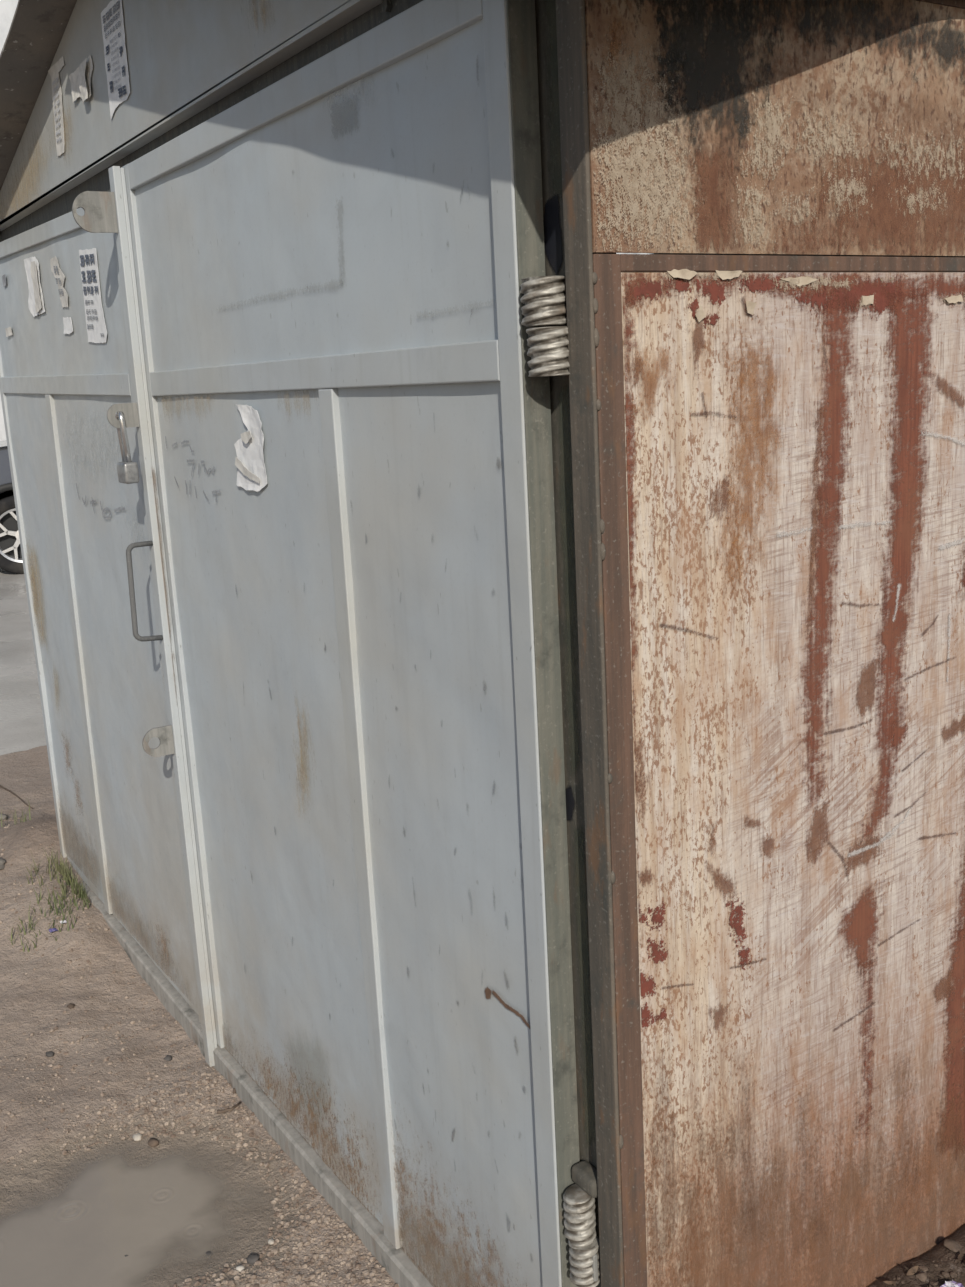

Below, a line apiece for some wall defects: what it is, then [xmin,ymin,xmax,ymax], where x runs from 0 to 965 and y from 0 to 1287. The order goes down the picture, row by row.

leakage [637,0,965,153]
rust [690,148,736,252]
rust [767,139,965,255]
peeling [663,269,750,282]
peeling [771,273,894,308]
peeling [942,291,965,306]
rust [623,273,965,876]
rust [837,888,884,1135]
rust [935,860,965,1158]
rust [248,1057,375,1212]
rust [395,1151,510,1287]